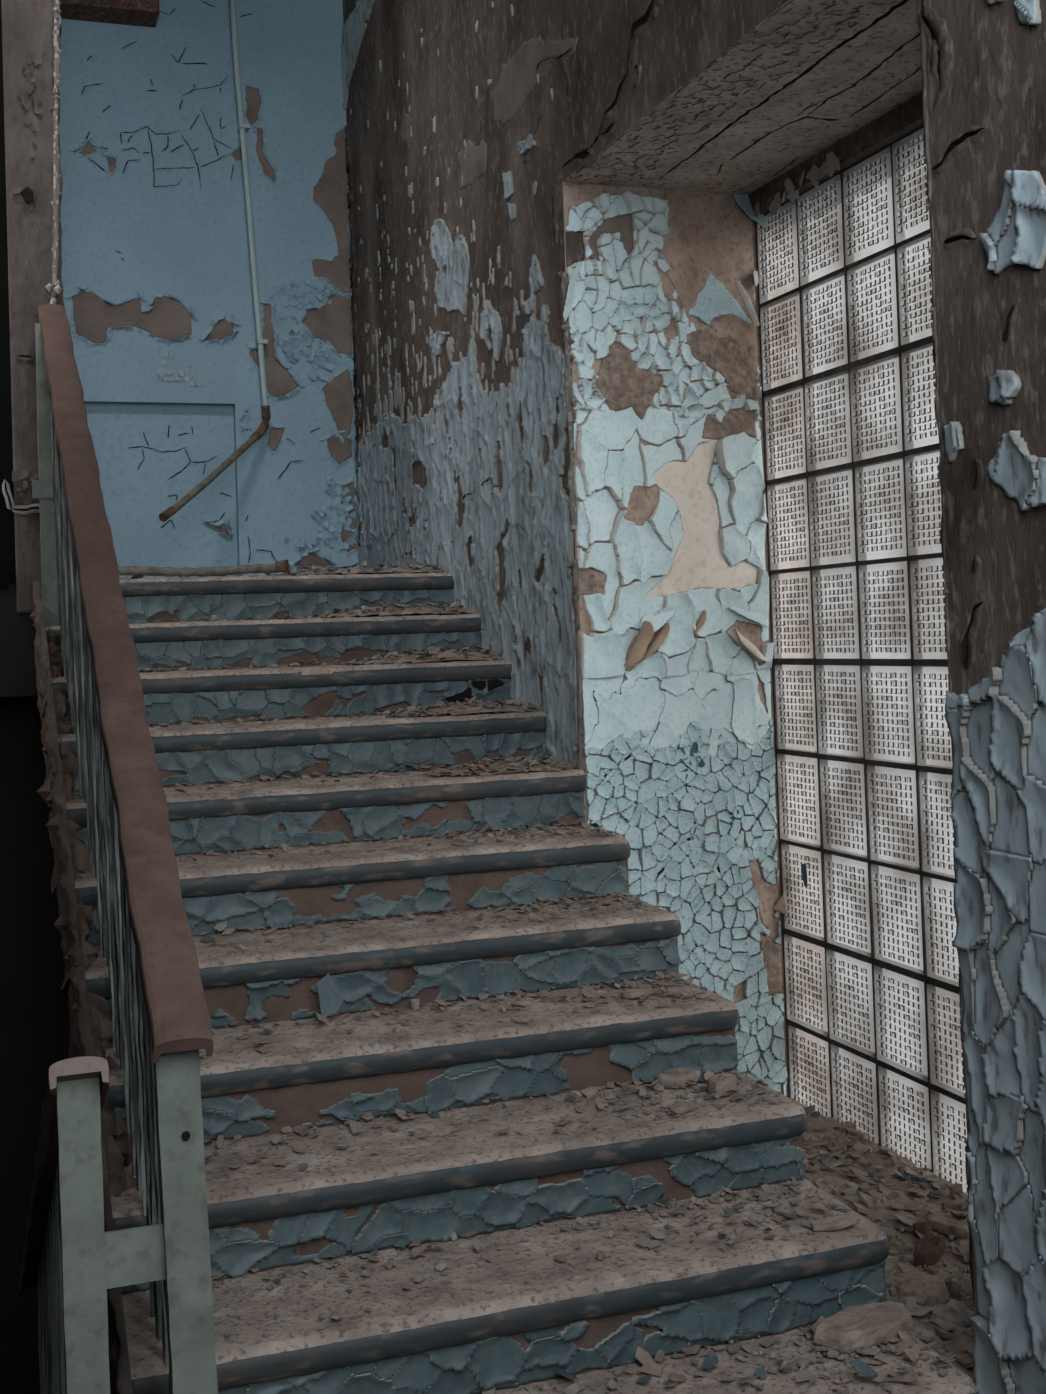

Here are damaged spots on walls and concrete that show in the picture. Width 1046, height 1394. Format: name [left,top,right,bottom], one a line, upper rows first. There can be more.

crack [74,41,236,191]
crack [522,0,665,244]
peeling [45,0,885,793]
crack [582,665,788,1096]